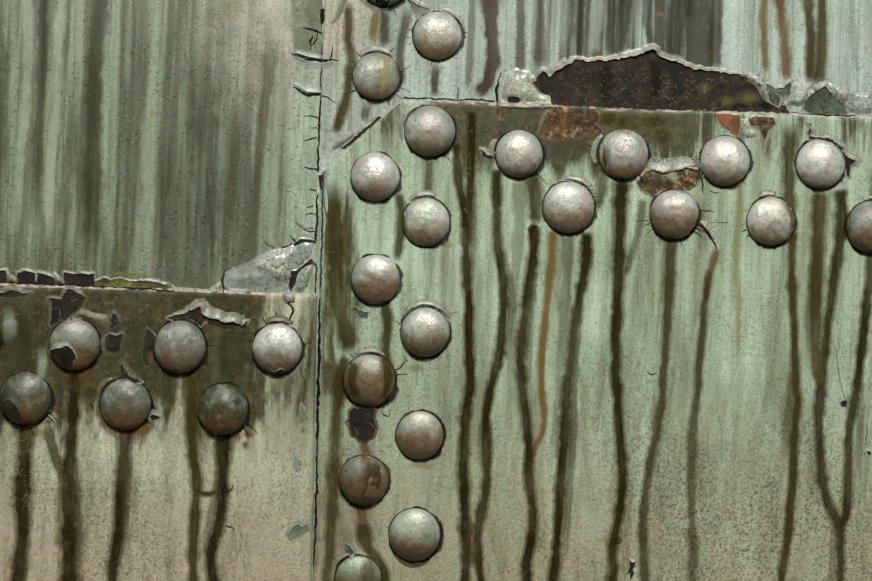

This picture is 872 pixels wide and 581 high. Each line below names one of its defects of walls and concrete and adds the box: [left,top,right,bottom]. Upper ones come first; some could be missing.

crack [381,0,551,135]
corrosion [477,0,500,95]
peeling [531,42,863,179]
peeling [0,267,169,328]
peeling [165,298,251,328]
crack [247,303,294,341]
peeling [284,257,315,292]
crack [265,9,362,567]
damp [453,113,542,581]
damp [593,149,633,581]
damp [809,190,872,581]
damp [184,374,233,581]